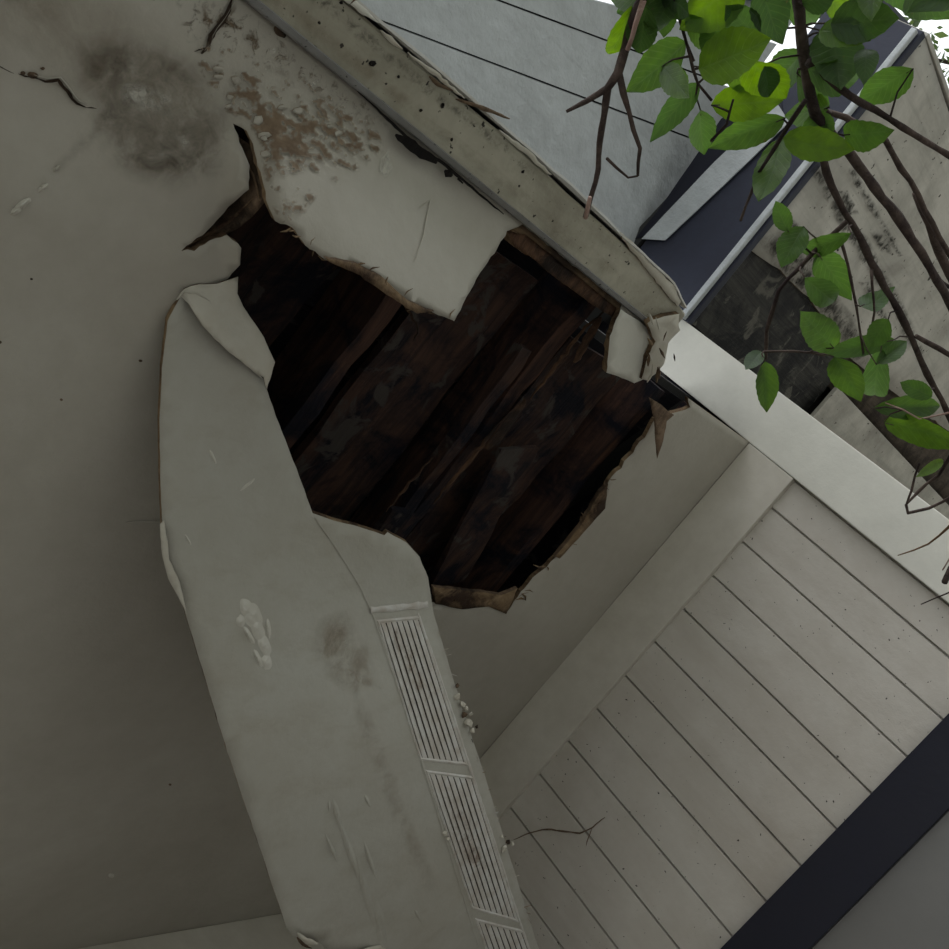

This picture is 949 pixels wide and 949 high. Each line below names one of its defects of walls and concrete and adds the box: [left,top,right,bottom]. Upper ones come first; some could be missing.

leakage [188,9,286,59]
crack [0,66,97,109]
peeling [187,47,381,247]
peeling [324,256,434,314]
peeling [619,232,681,306]
peeling [176,276,275,389]
peeling [553,482,608,558]
peeling [431,584,518,614]